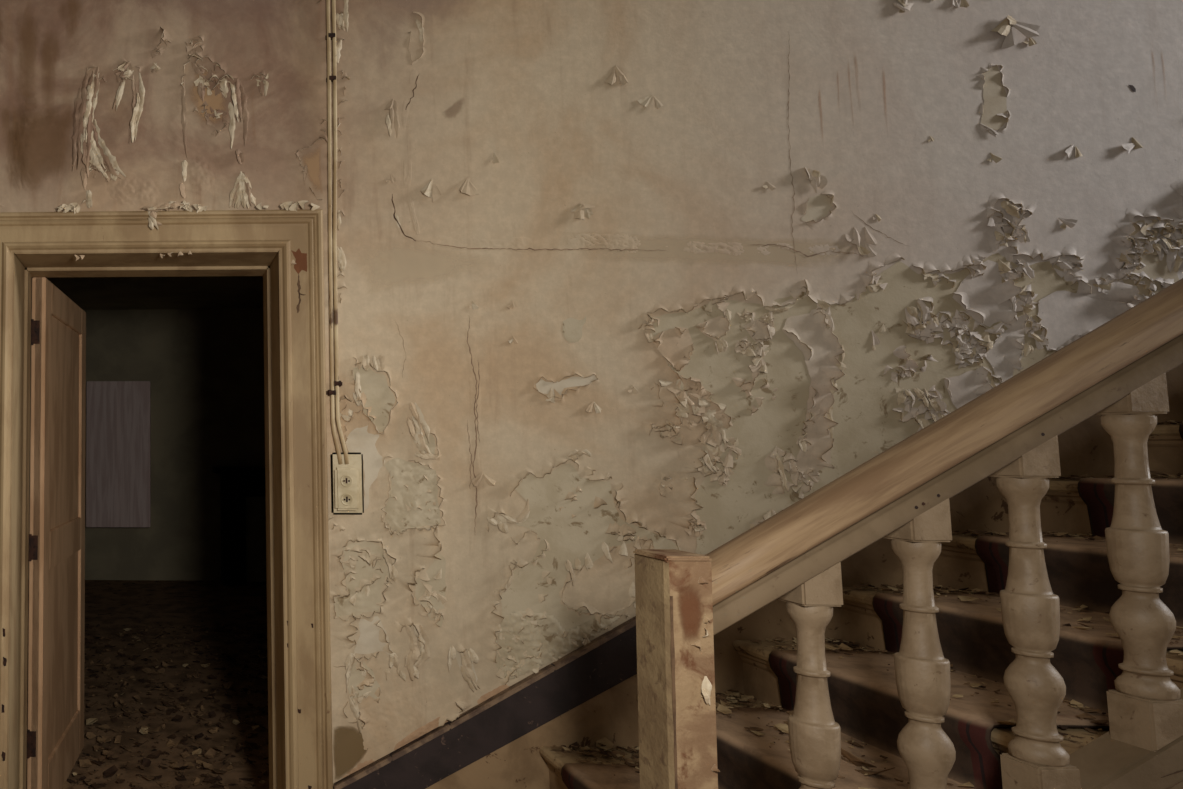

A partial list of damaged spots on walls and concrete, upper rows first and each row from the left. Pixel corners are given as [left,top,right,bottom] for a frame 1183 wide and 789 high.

peeling [991,15,1040,49]
peeling [57,26,320,230]
peeling [318,0,350,303]
peeling [976,62,1012,137]
peeling [1065,144,1083,158]
peeling [801,167,841,230]
peeling [328,192,1183,778]